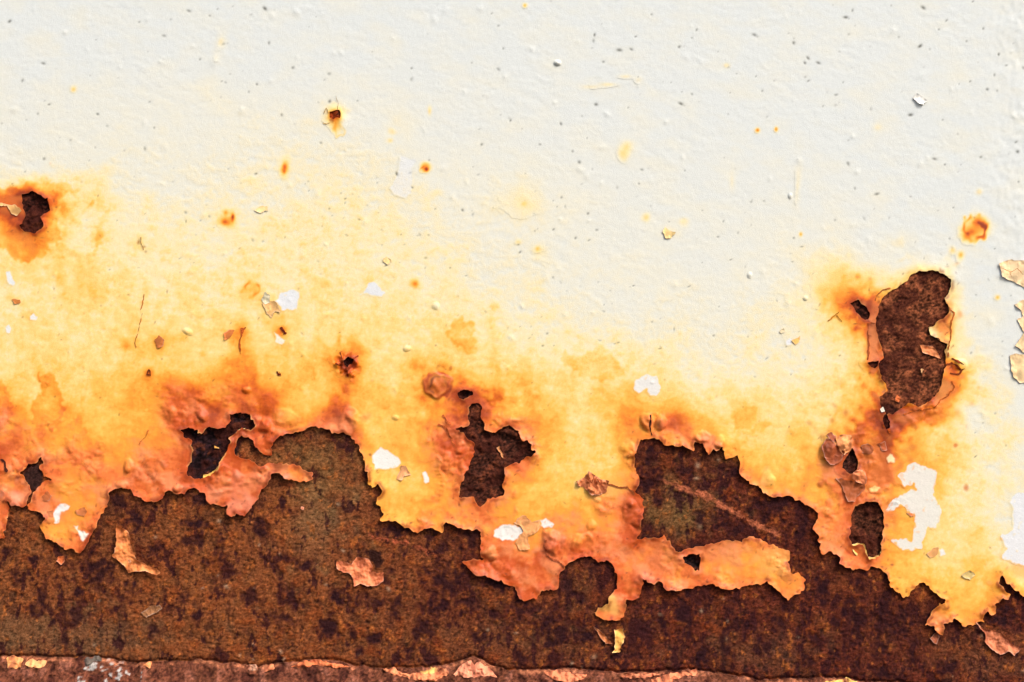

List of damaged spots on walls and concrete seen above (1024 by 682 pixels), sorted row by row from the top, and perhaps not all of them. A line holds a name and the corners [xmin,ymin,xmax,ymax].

corrosion [0,101,1024,621]
peeling [999,259,1024,287]
peeling [1010,300,1024,383]
peeling [0,397,1024,682]